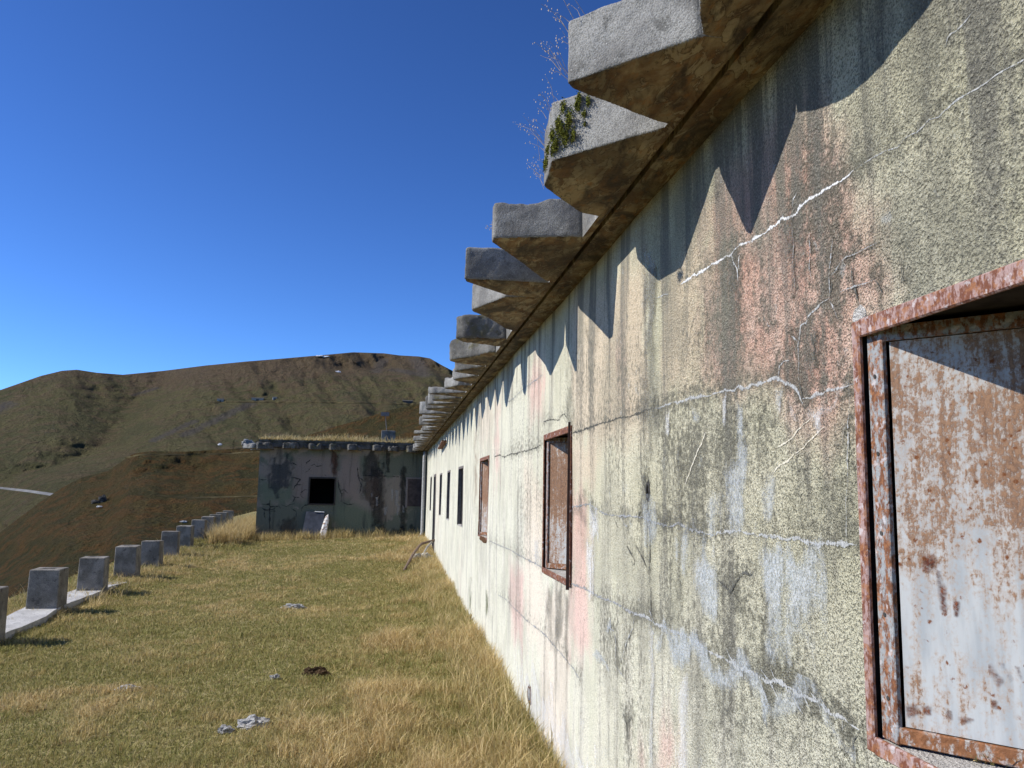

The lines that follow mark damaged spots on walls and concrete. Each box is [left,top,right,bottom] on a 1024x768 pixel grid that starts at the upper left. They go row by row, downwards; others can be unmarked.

crack [495,60,1023,458]
leakage [363,450,415,536]
crack [571,415,860,763]
leakage [729,447,746,522]